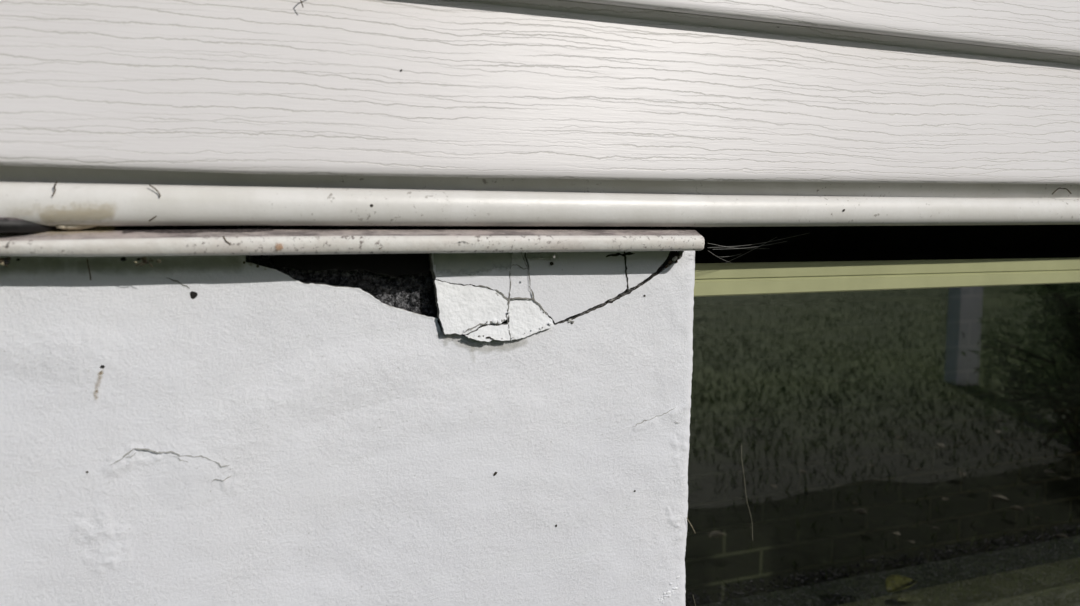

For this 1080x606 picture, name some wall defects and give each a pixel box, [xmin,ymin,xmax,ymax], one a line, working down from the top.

peeling [243,251,671,342]
crack [465,251,681,339]
crack [98,442,246,504]